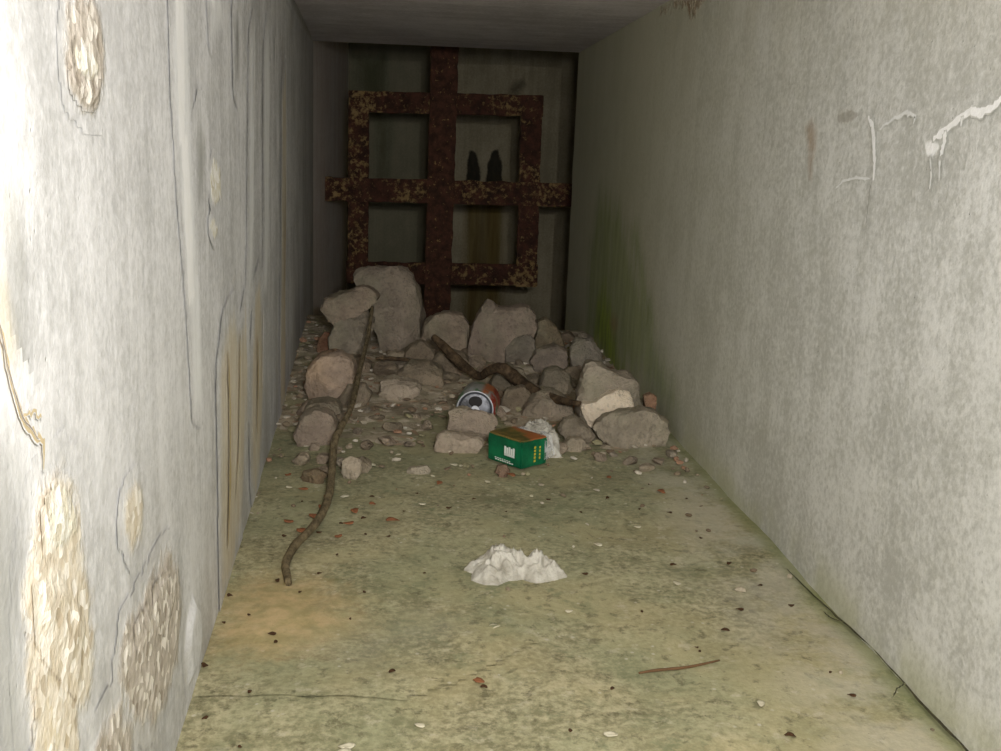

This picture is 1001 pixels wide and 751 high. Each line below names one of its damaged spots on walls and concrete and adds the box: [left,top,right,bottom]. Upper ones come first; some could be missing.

spalling [56,0,111,135]
crack [834,95,1001,223]
crack [0,321,46,474]
peeling [8,427,184,751]